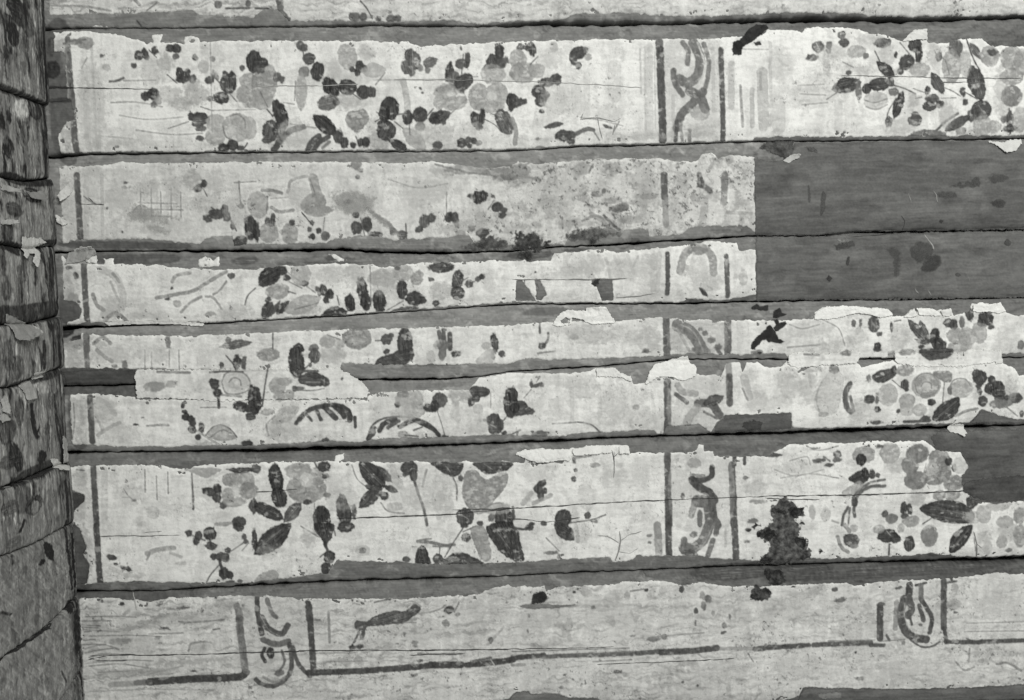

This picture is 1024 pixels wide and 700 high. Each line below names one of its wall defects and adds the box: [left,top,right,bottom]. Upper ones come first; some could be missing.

peeling [754,139,1024,320]
peeling [63,367,370,402]
peeling [596,368,632,381]
peeling [645,356,697,384]
peeling [932,410,1024,504]
leakage [747,496,823,601]